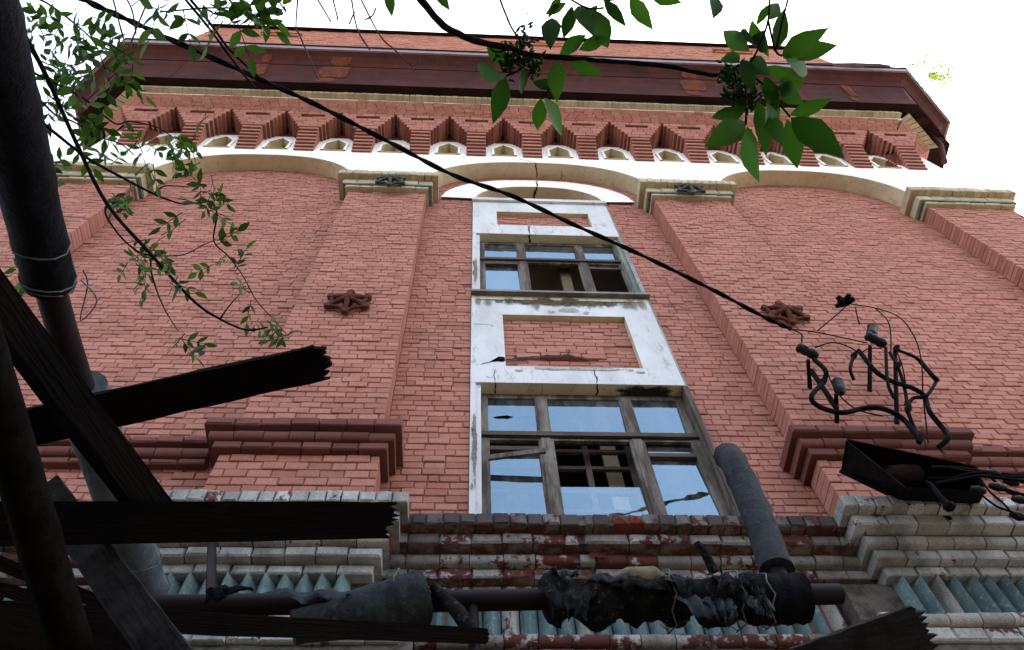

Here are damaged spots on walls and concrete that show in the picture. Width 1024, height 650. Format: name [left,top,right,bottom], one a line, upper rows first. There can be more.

crack [519,157,562,199]
crack [486,349,599,395]
spalling [612,515,646,535]